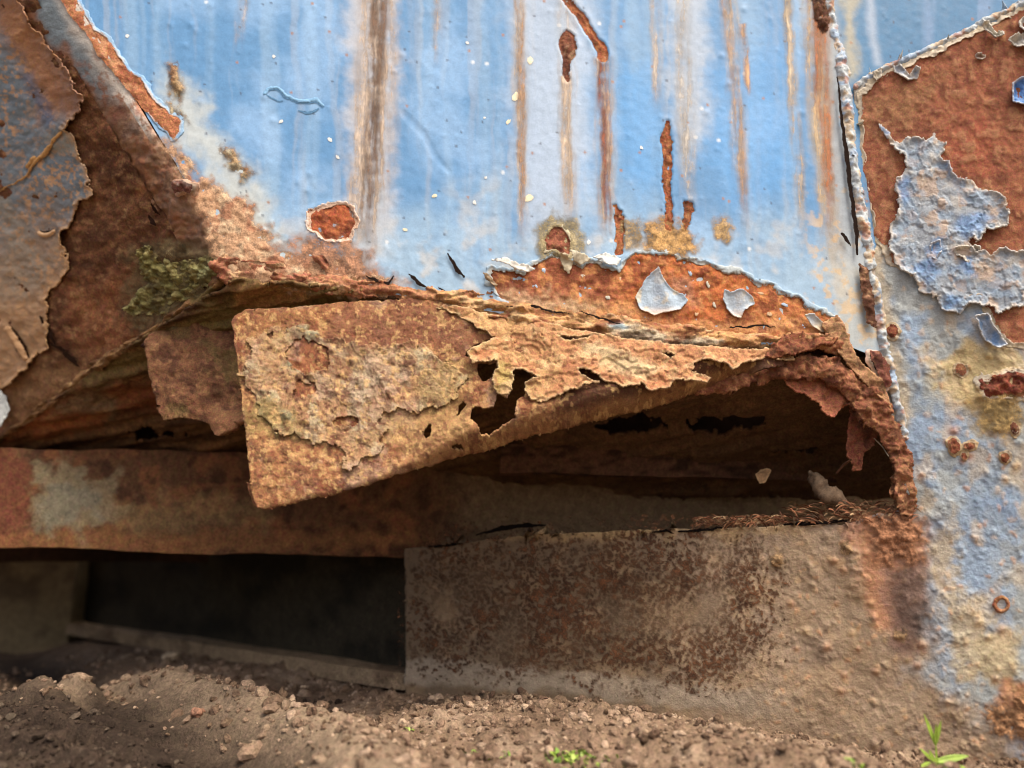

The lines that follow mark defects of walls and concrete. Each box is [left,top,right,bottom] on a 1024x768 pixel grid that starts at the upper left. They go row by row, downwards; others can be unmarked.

peeling [0,0,93,427]
corrosion [160,0,396,290]
corrosion [561,71,573,198]
corrosion [596,58,613,220]
crack [836,77,859,255]
corrosion [856,6,1024,350]
corrosion [436,215,840,403]
corrosion [967,367,1024,438]
corrosion [853,508,930,648]